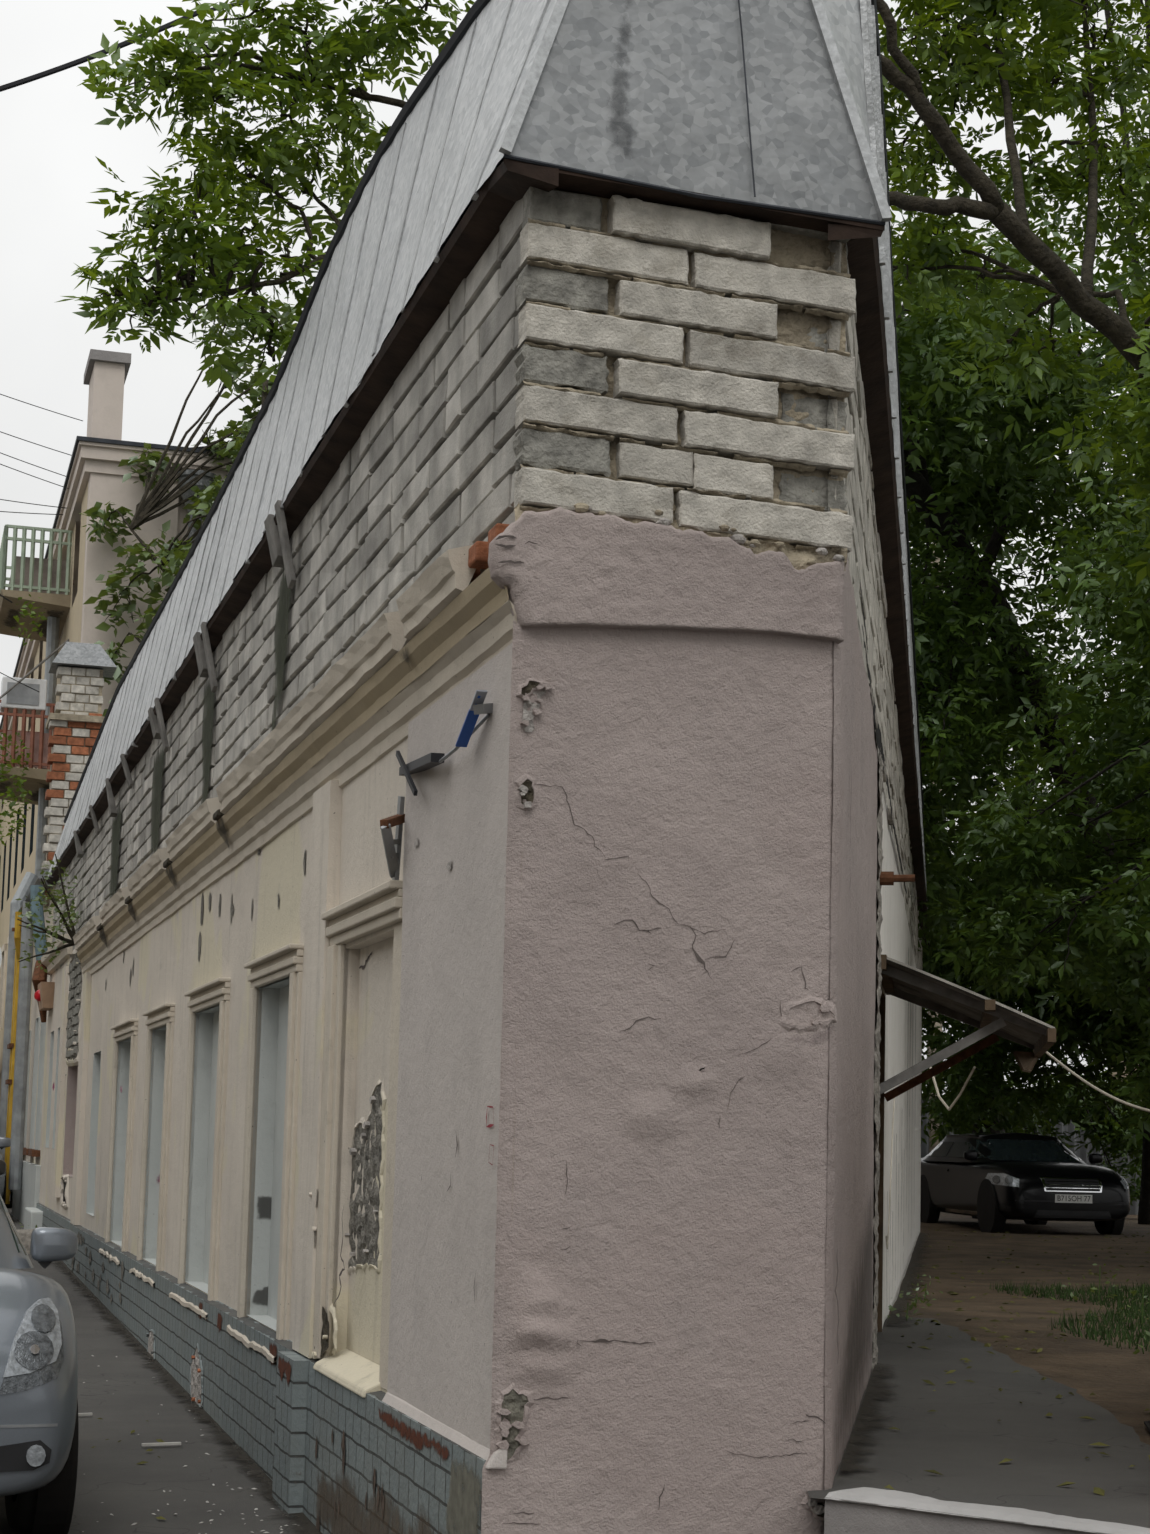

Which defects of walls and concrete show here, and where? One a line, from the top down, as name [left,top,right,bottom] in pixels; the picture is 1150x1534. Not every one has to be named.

spalling [516,678,553,732]
spalling [514,773,538,811]
crack [536,784,734,979]
spalling [345,1079,386,1275]
rust [379,1409,449,1460]
spalling [493,1383,535,1464]